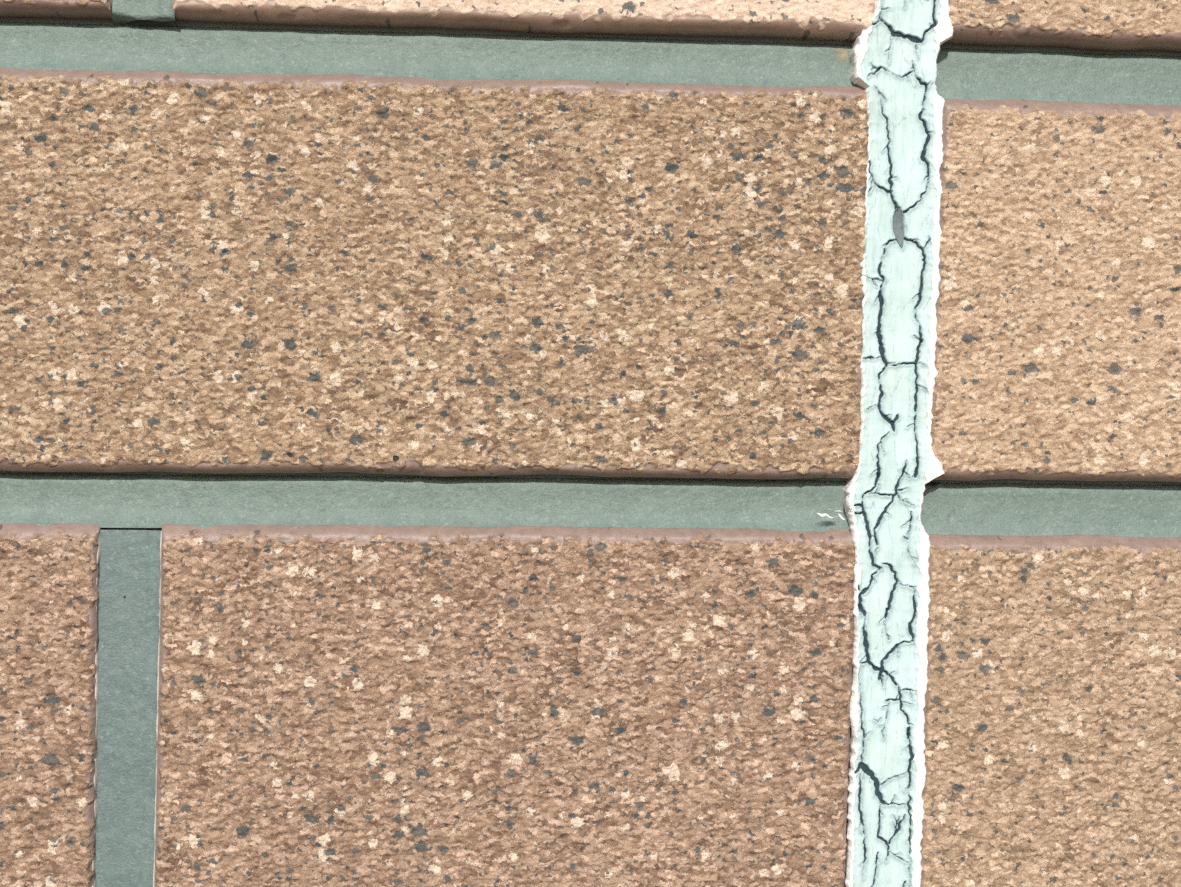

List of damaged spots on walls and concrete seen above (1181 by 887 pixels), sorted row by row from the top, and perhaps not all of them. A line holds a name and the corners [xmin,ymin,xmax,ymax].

crack [854,0,937,887]